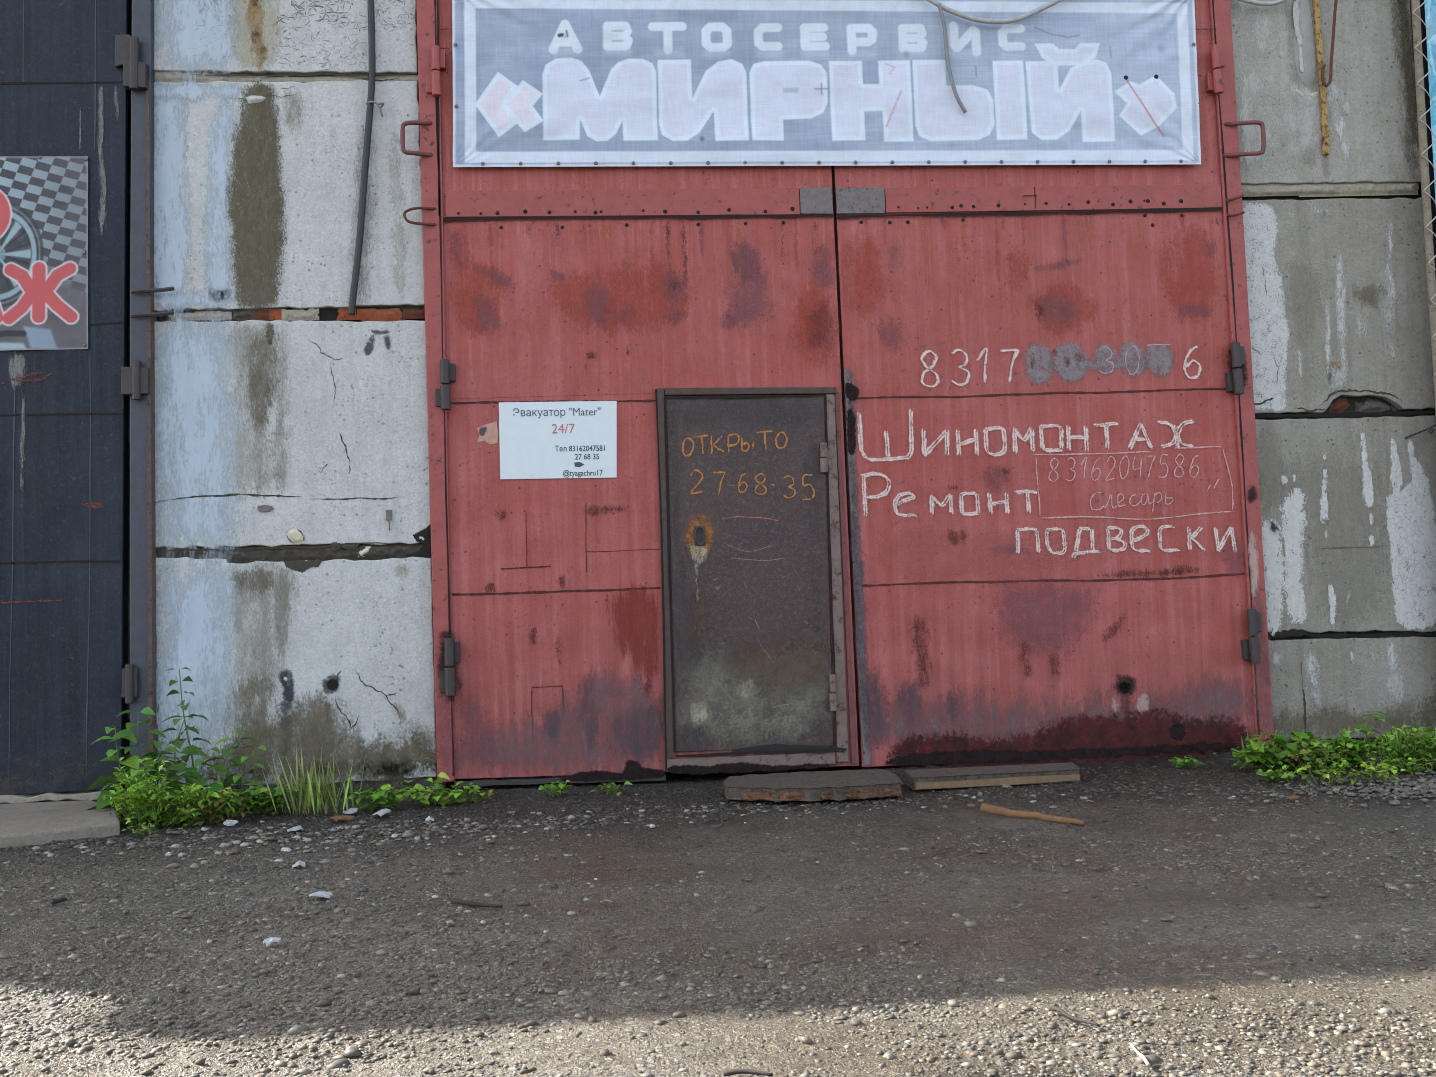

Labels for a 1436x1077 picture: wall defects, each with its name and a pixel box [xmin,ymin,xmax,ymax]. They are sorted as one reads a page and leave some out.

corrosion [235,0,278,67]
water stain [226,80,301,490]
peeling [154,0,431,783]
peeling [1243,202,1290,411]
spalling [1319,389,1402,413]
corrosion [685,515,714,599]
peeling [1385,438,1436,631]
water stain [228,568,494,786]
crack [335,670,405,729]